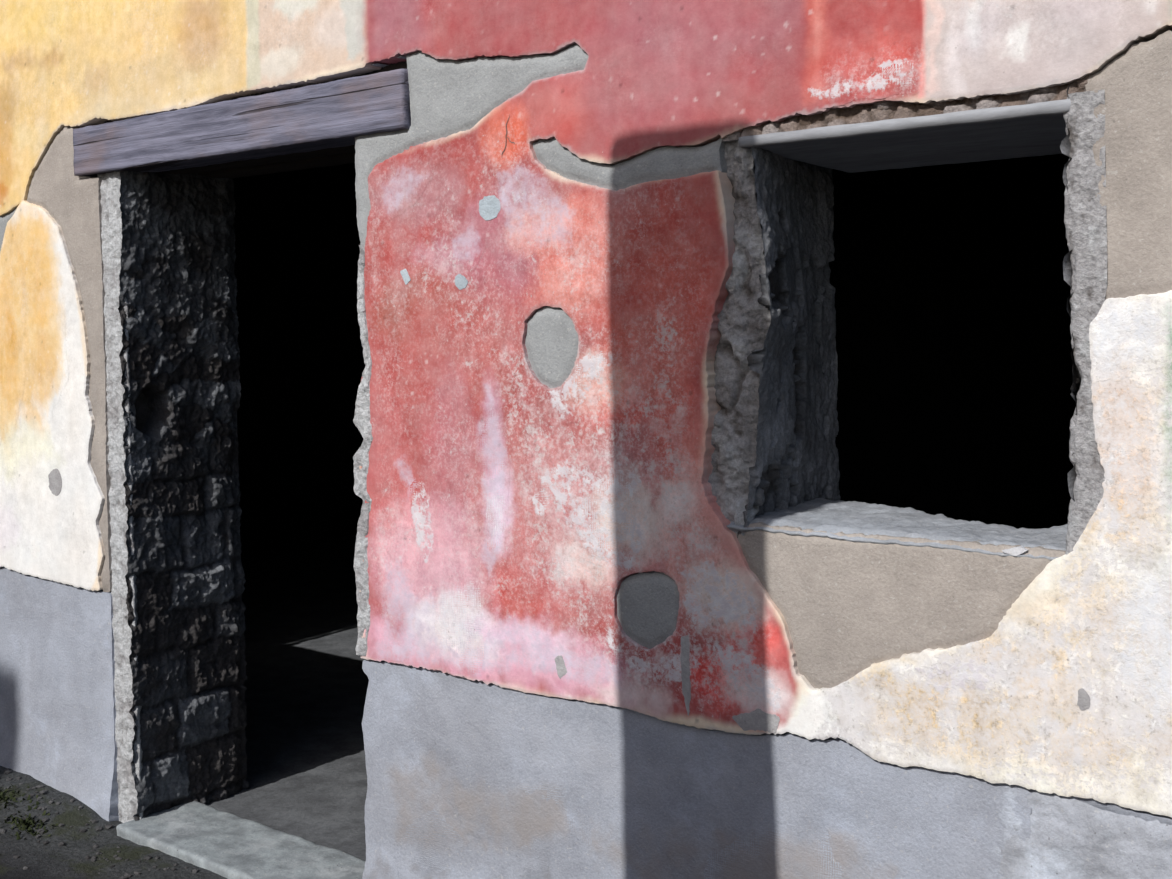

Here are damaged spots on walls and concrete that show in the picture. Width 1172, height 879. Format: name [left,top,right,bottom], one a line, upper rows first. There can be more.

flaking render [353,44,588,656]
damp [539,344,622,428]
flaking render [525,30,1172,689]
spalling [0,126,143,823]
damp [362,376,912,879]
flaking render [617,571,691,716]
flaking render [732,708,780,733]
flaking render [1077,688,1090,710]
damp [976,782,1032,879]
flaking render [998,785,1172,879]